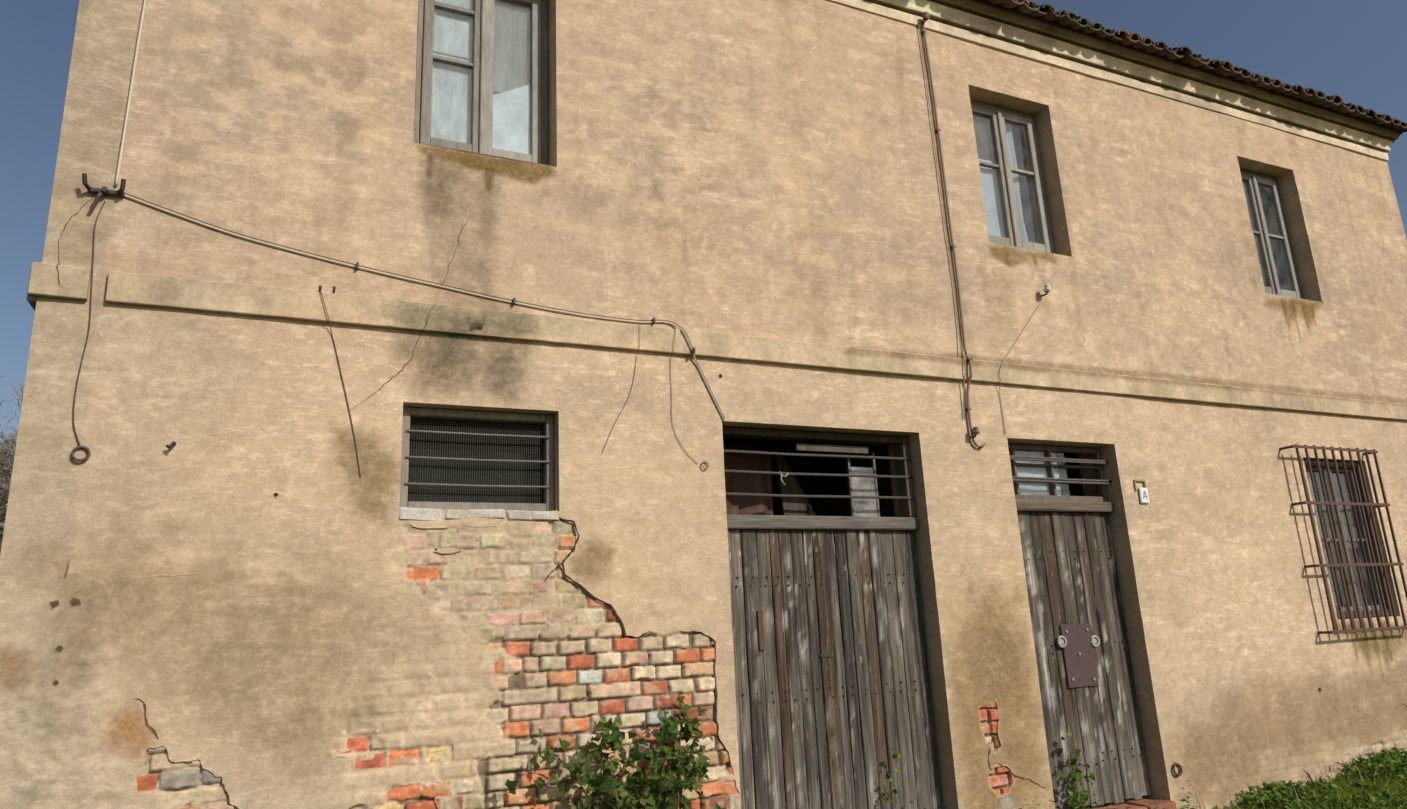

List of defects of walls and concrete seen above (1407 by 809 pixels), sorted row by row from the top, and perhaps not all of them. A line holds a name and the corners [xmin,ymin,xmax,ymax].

spalling [49,597,81,609]
flaking render [329,516,740,809]
flaking render [136,746,239,809]
flaking render [979,701,1016,809]